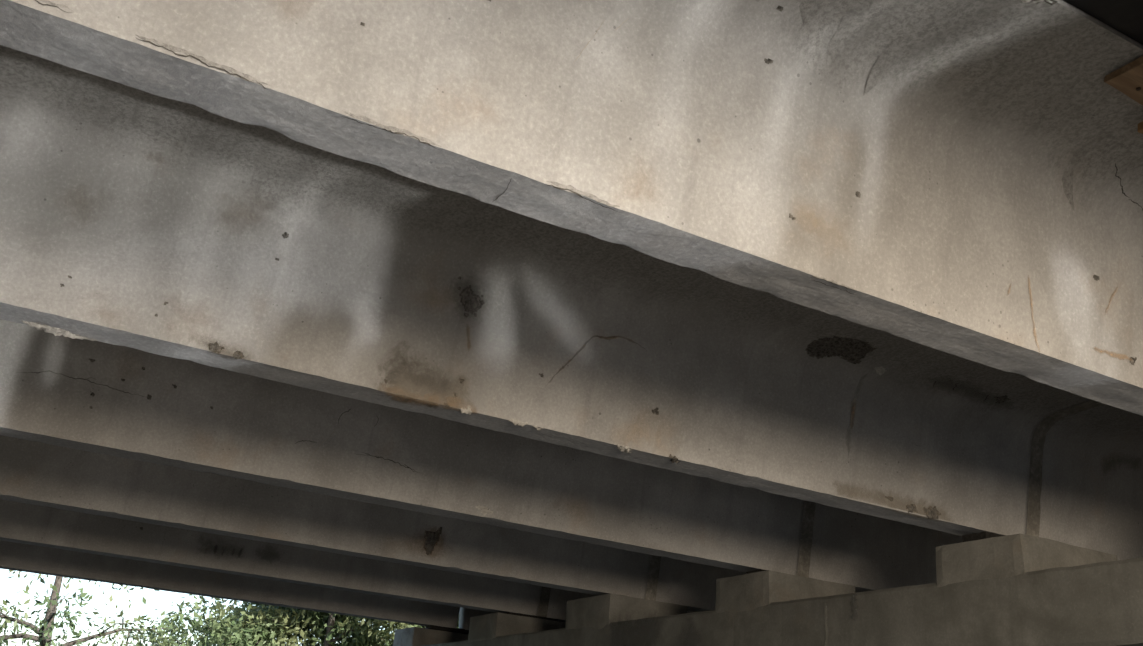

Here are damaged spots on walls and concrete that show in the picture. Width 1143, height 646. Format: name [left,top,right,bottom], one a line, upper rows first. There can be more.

spalling [457,277,485,318]
spalling [806,336,877,364]